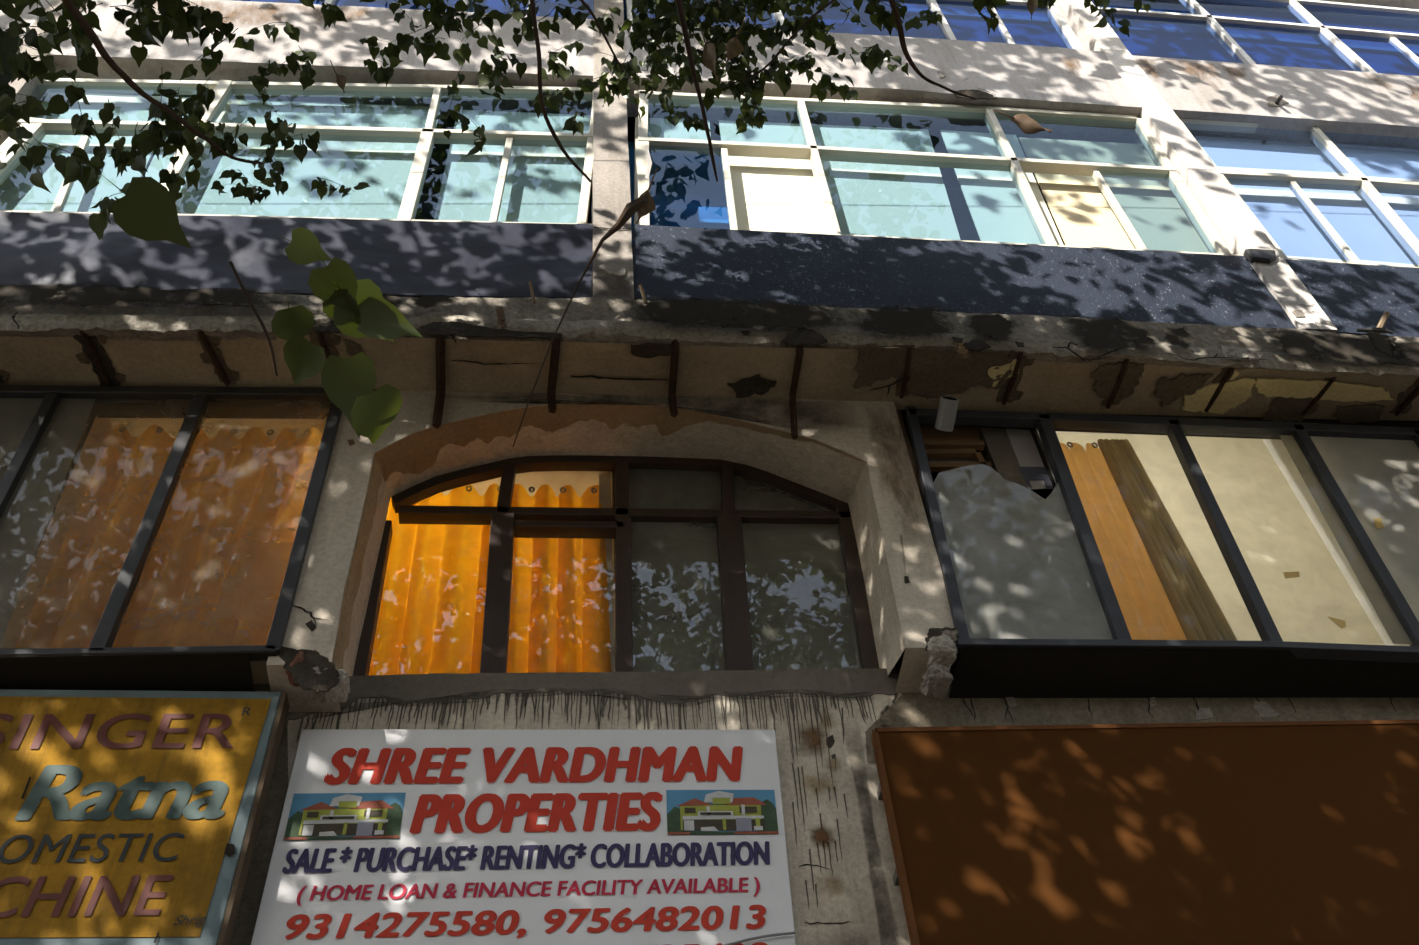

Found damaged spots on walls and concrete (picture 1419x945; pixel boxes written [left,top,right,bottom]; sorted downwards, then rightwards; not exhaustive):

spalling [308,320,363,360]
spalling [421,321,562,339]
flaking render [630,343,673,358]
flaking render [727,374,777,398]
flaking render [854,339,1036,405]
flaking render [1090,345,1419,422]
peeling [277,403,863,703]
spalling [919,627,958,699]
rust [801,727,823,749]
damp [297,690,903,939]
rust [813,827,832,846]